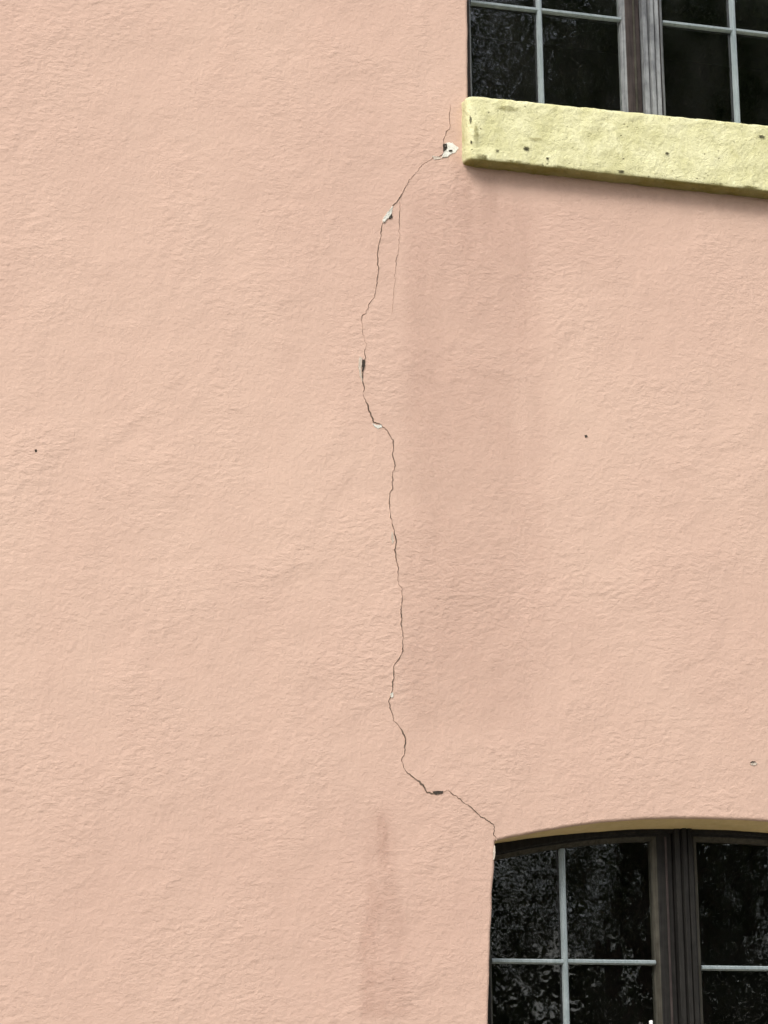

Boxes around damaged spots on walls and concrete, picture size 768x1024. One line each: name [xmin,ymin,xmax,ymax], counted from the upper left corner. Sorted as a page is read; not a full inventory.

crack [358,107,497,841]